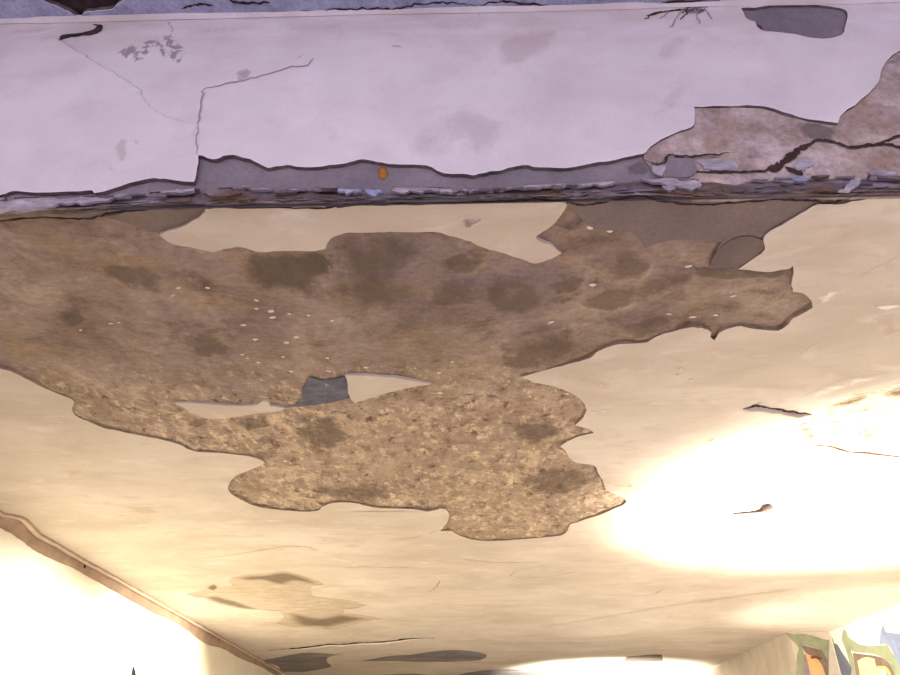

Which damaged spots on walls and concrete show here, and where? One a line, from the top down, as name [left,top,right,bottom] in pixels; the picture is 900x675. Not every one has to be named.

leakage [117,21,187,67]
crack [645,0,720,28]
flaking render [741,5,848,39]
crack [27,24,313,154]
corrosion [377,166,389,181]
flaking render [0,51,900,541]